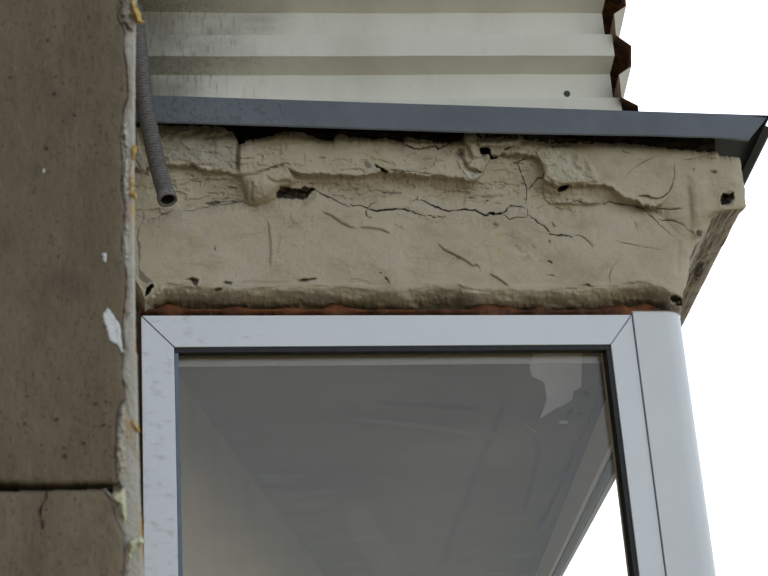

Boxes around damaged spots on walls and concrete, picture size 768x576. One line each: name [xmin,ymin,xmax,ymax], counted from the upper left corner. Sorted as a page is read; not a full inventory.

crack [402,141,450,150]
spalling [476,133,604,192]
crack [137,198,245,248]
hole [276,187,315,200]
crack [317,144,593,248]
crack [573,149,702,250]